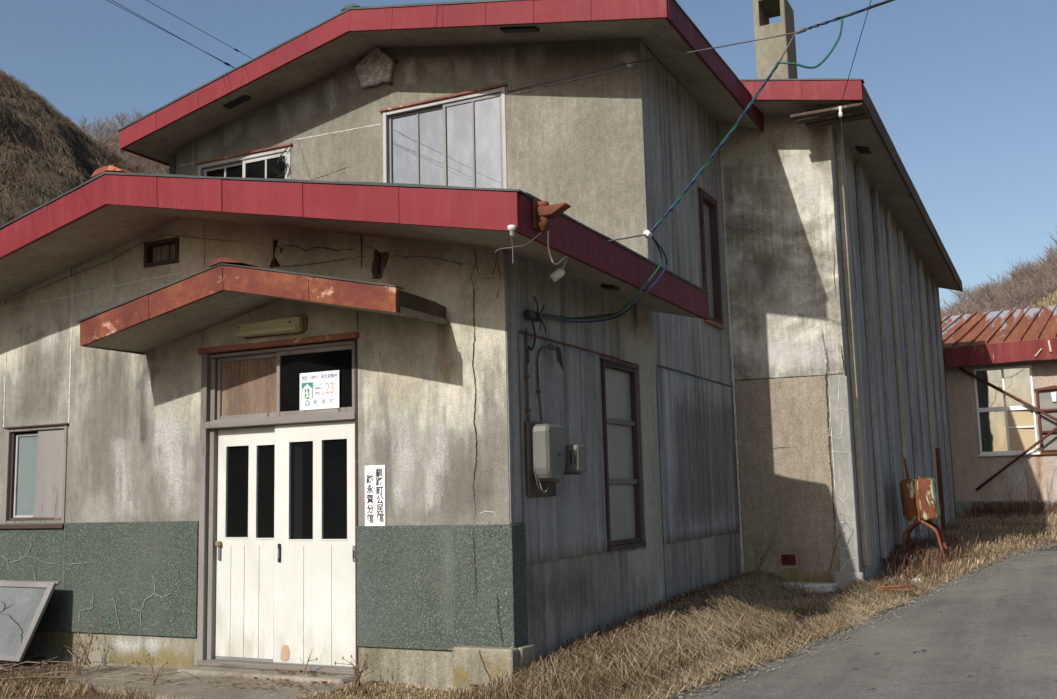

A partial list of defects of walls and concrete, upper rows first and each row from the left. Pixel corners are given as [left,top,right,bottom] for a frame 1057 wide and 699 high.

water stain [376,356,423,397]
water stain [749,341,826,364]
water stain [154,383,189,500]
crack [18,234,503,686]
water stain [426,425,445,505]